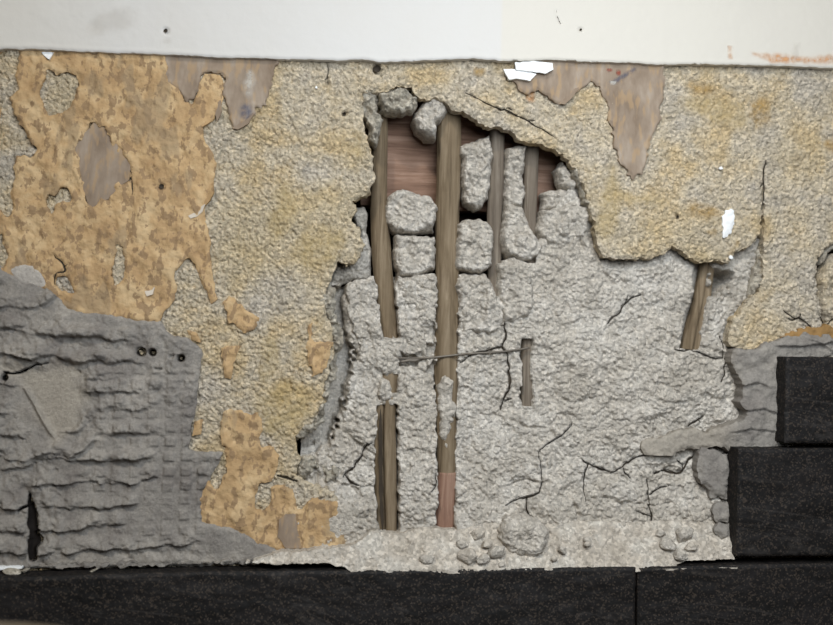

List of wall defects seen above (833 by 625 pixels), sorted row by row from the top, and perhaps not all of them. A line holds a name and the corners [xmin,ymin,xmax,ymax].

flaking render [362,87,418,150]
crack [466,93,555,138]
peeling [503,61,666,180]
peeling [0,50,279,333]
flaking render [296,285,344,441]
crack [460,323,512,410]
crack [675,336,726,382]
crack [505,424,572,514]
crack [583,454,693,521]